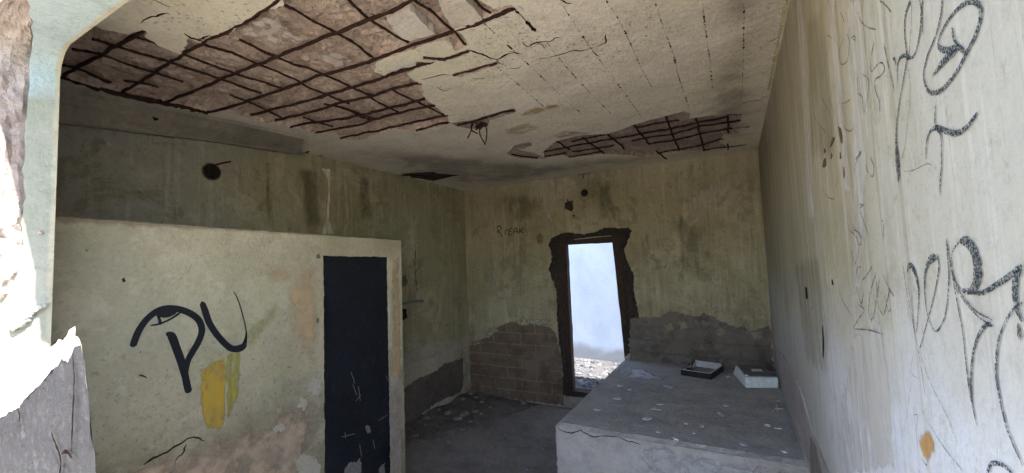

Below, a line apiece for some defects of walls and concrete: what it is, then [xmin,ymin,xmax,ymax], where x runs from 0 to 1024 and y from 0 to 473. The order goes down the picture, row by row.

spalling [60,0,517,145]
spalling [507,111,749,160]
flaking render [822,127,845,178]
flaking render [379,228,830,473]
crack [555,425,639,444]